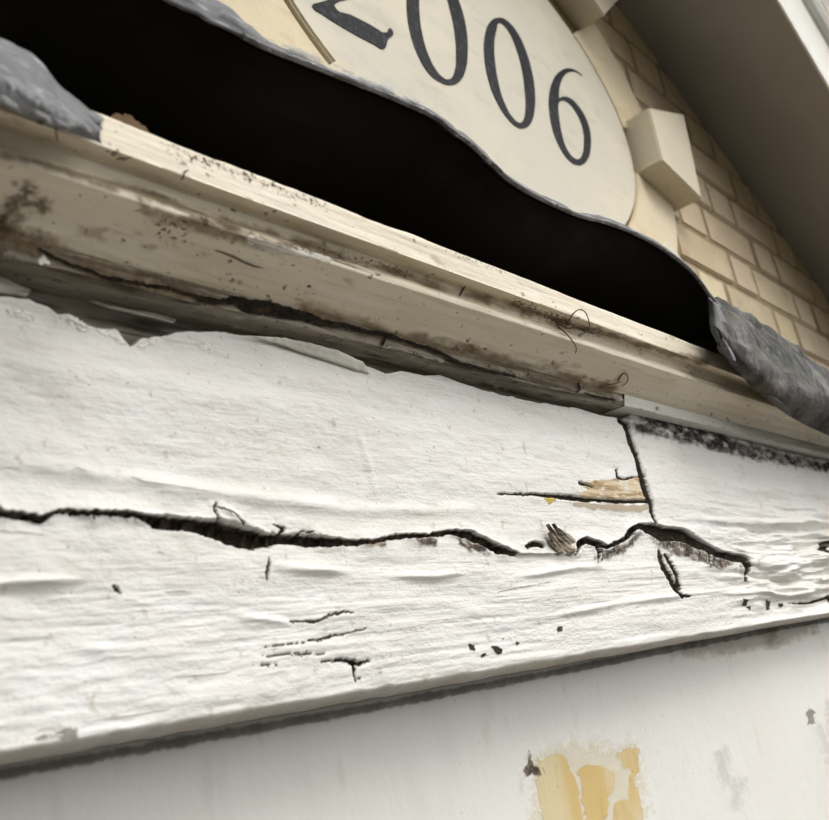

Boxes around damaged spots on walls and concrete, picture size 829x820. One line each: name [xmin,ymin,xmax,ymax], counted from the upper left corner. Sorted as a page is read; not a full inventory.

leakage [189,218,246,241]
peeling [60,314,126,344]
peeling [246,335,371,374]
leakage [412,335,529,373]
leakage [552,373,585,389]
leakage [625,409,829,472]
peeling [574,477,649,512]
crack [500,382,749,598]
crack [0,477,538,577]
crack [261,611,365,680]
crack [173,671,228,679]
peeling [524,756,541,776]